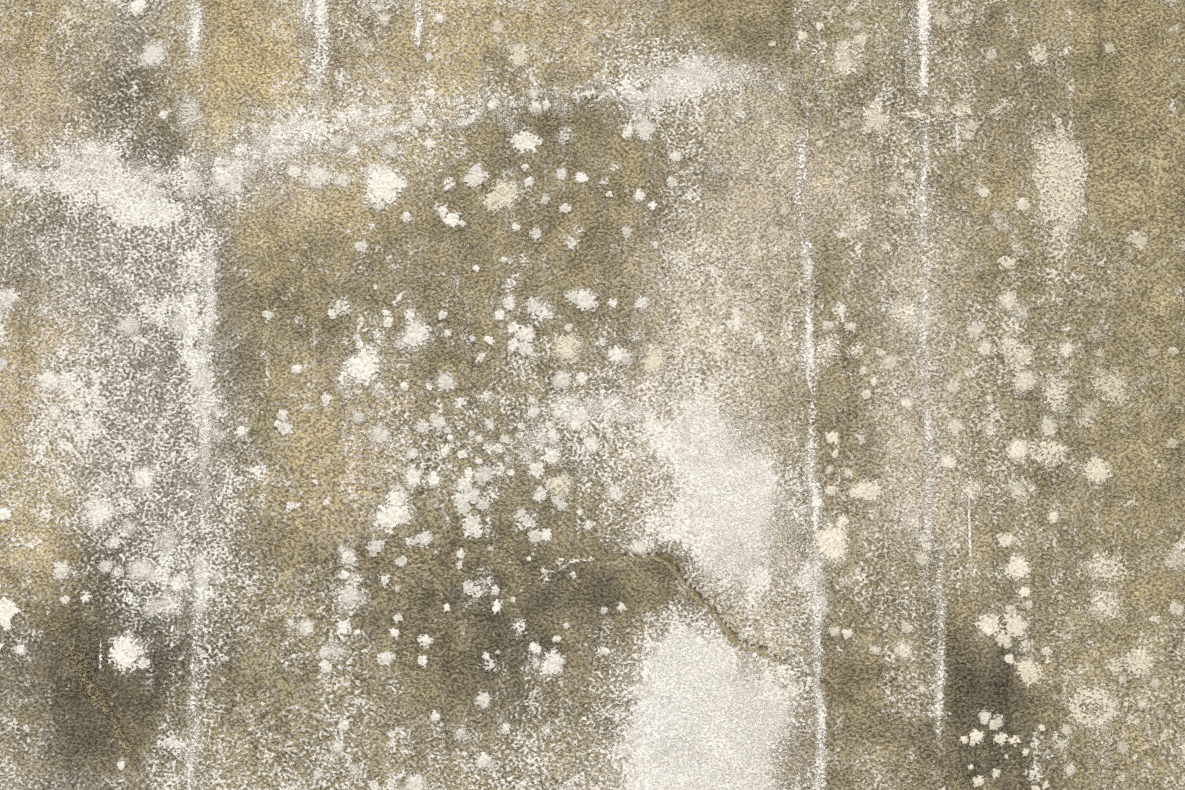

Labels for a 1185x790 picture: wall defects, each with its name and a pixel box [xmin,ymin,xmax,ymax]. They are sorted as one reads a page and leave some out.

crack [520,538,962,790]